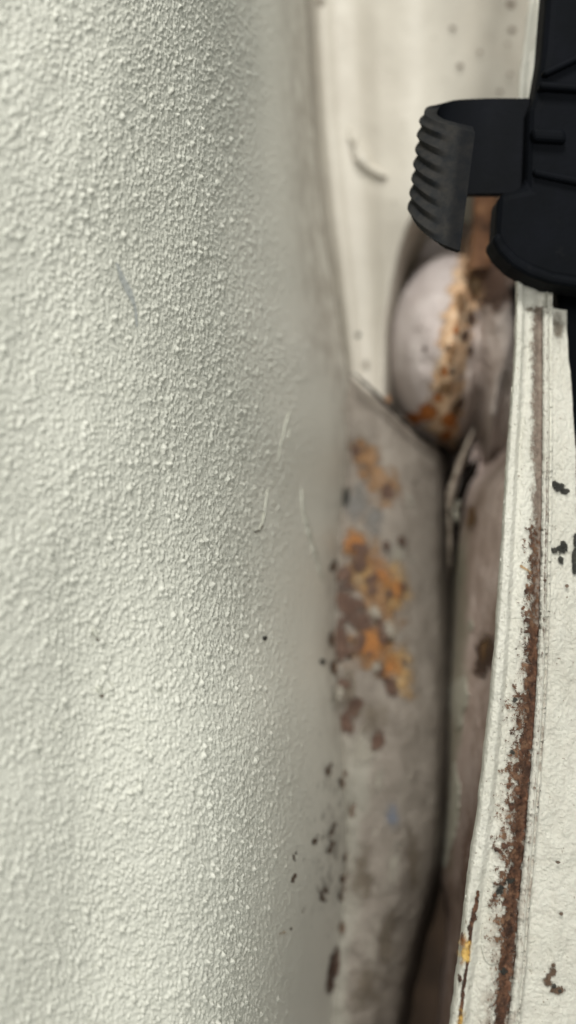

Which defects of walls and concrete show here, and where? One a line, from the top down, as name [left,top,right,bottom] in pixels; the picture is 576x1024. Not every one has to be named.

rust [405,197,509,455]
rust [350,437,400,508]
rust [335,529,411,696]
rust [482,307,549,1024]